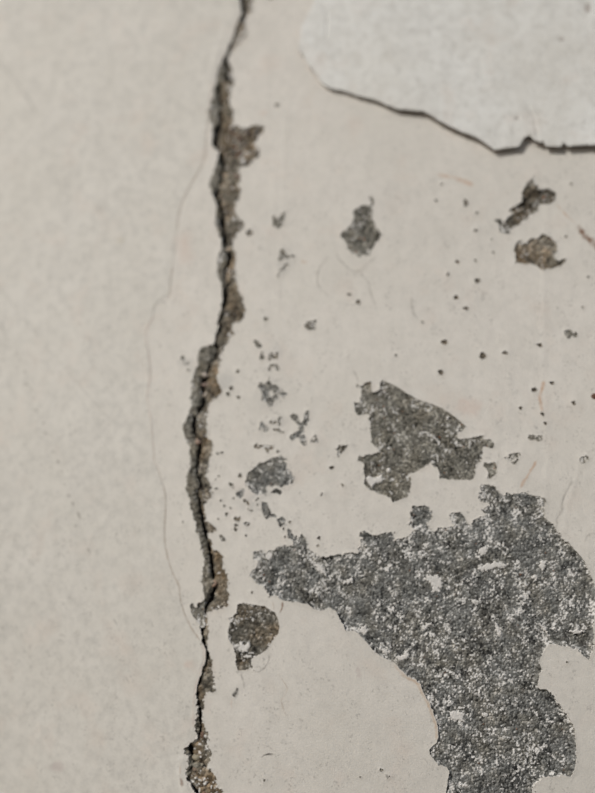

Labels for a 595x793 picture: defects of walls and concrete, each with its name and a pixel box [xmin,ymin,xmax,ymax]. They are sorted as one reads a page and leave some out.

peeling [298,0,595,150]
spalling [341,198,382,258]
spalling [495,175,556,234]
spalling [514,234,566,270]
crack [144,0,265,793]
peeling [253,340,287,407]
spalling [236,381,595,793]
spalling [228,603,280,671]